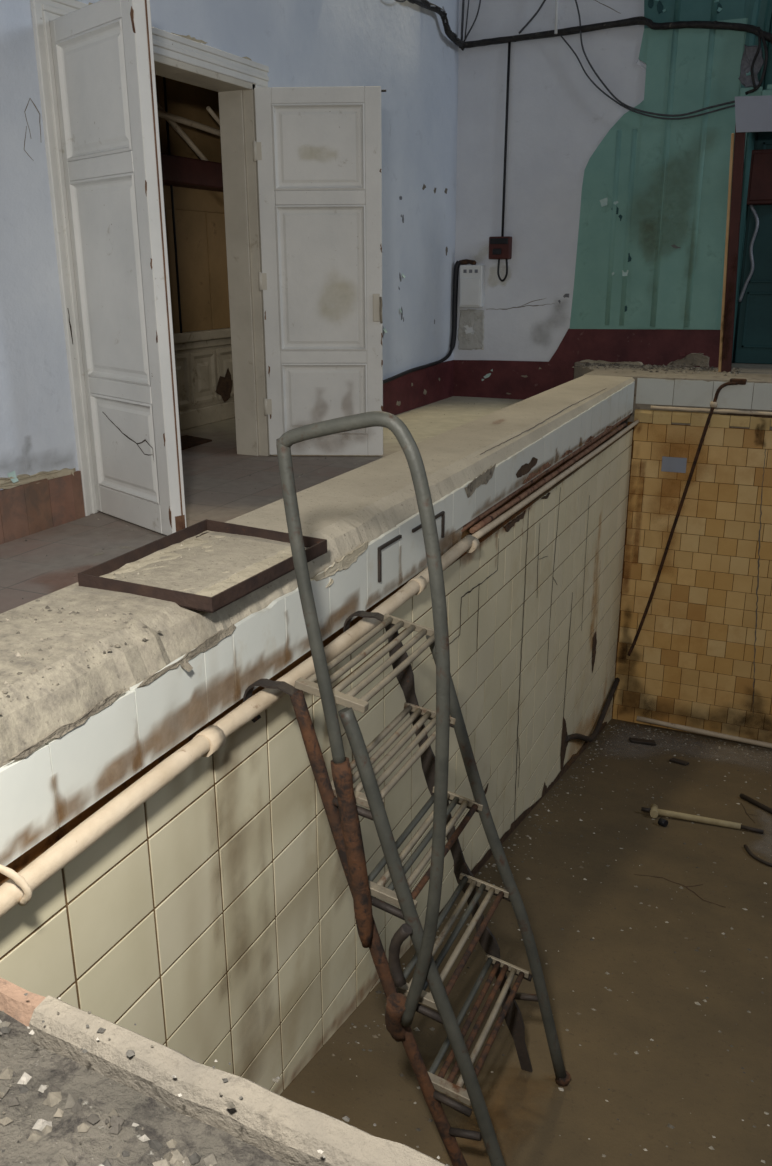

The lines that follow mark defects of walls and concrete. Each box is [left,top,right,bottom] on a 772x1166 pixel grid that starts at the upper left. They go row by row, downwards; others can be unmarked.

spalling [465,464,496,498]